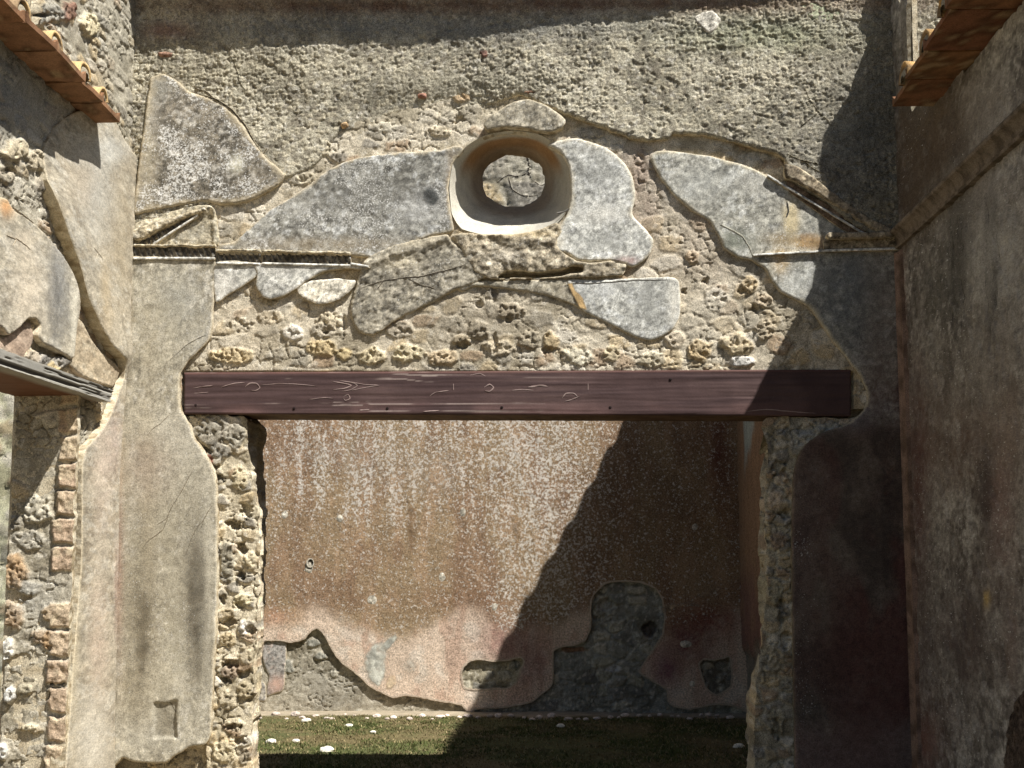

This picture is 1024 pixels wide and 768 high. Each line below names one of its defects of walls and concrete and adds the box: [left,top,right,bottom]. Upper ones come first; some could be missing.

crack [497,158,545,198]
crack [362,264,466,289]
spalling [142,93,867,768]
crack [143,466,195,547]